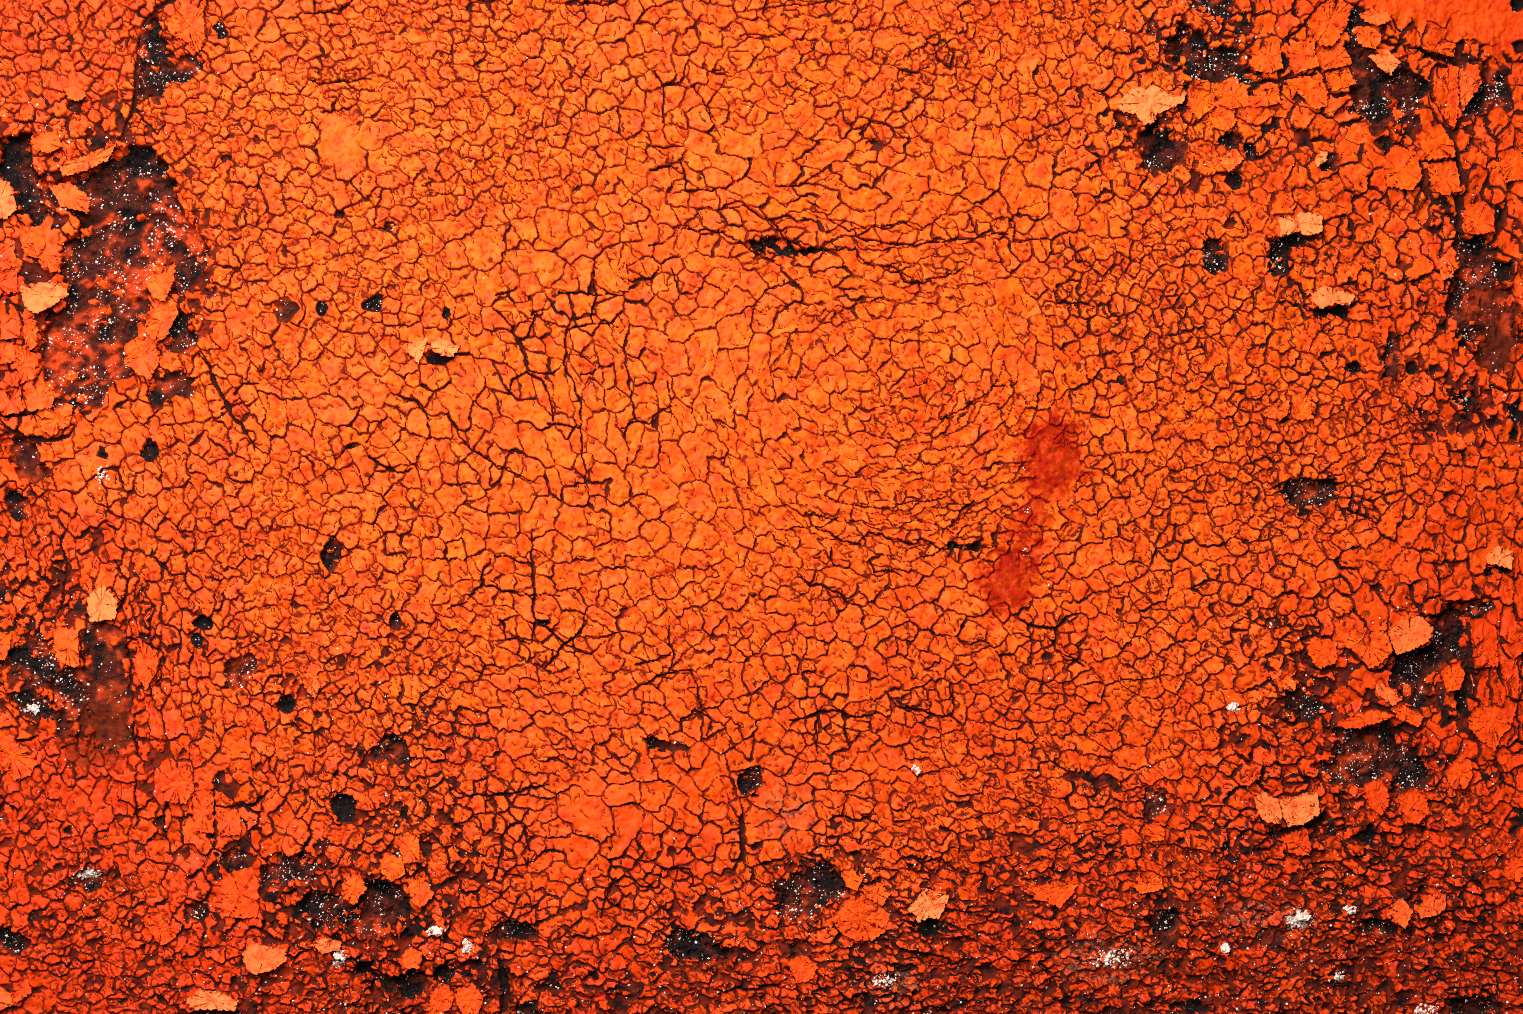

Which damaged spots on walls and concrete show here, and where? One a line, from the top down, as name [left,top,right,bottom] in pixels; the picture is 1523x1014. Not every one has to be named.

crack [1291,66,1349,99]
crack [0,184,72,337]
crack [42,208,82,253]
spalling [0,131,212,523]
spalling [1113,0,1516,382]
spalling [0,585,159,753]
crack [51,723,129,813]
spalling [141,767,434,954]
crack [716,758,761,821]
spalling [1253,601,1523,856]
crack [1484,623,1523,750]
spalling [357,947,539,1014]